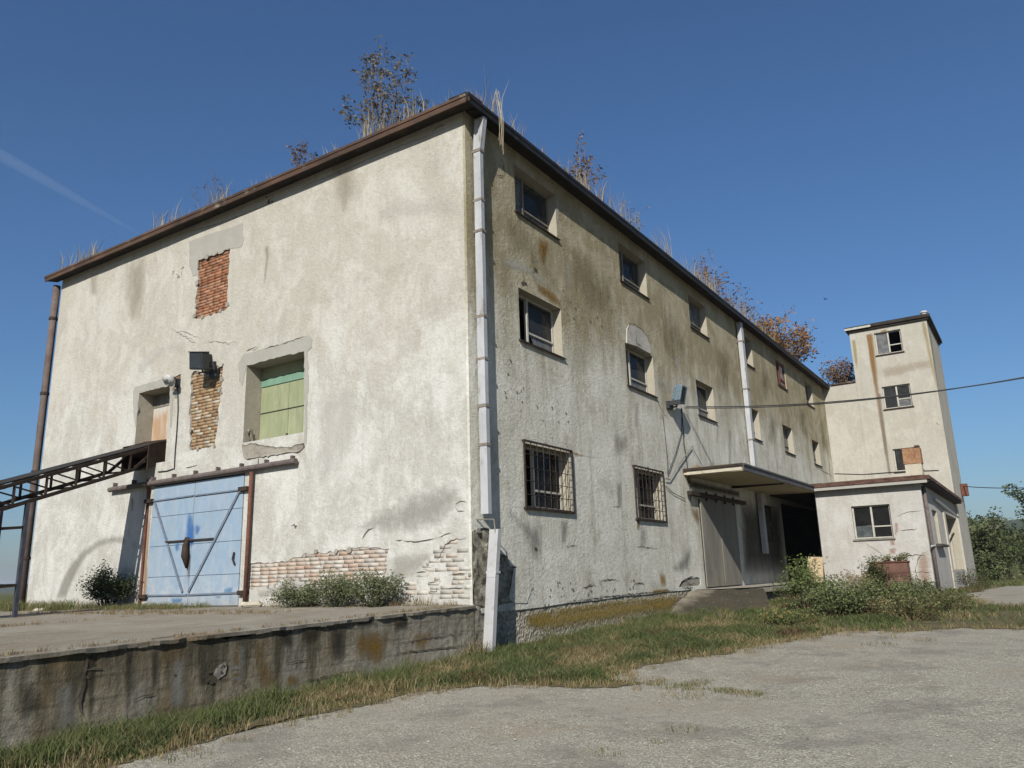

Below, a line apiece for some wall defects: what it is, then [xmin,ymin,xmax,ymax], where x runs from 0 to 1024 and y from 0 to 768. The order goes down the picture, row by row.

flaking render [192,250,230,319]
rust [868,330,886,393]
flaking render [171,363,224,451]
flaking render [248,546,389,590]
crack [397,500,467,592]
flaking render [402,528,533,608]